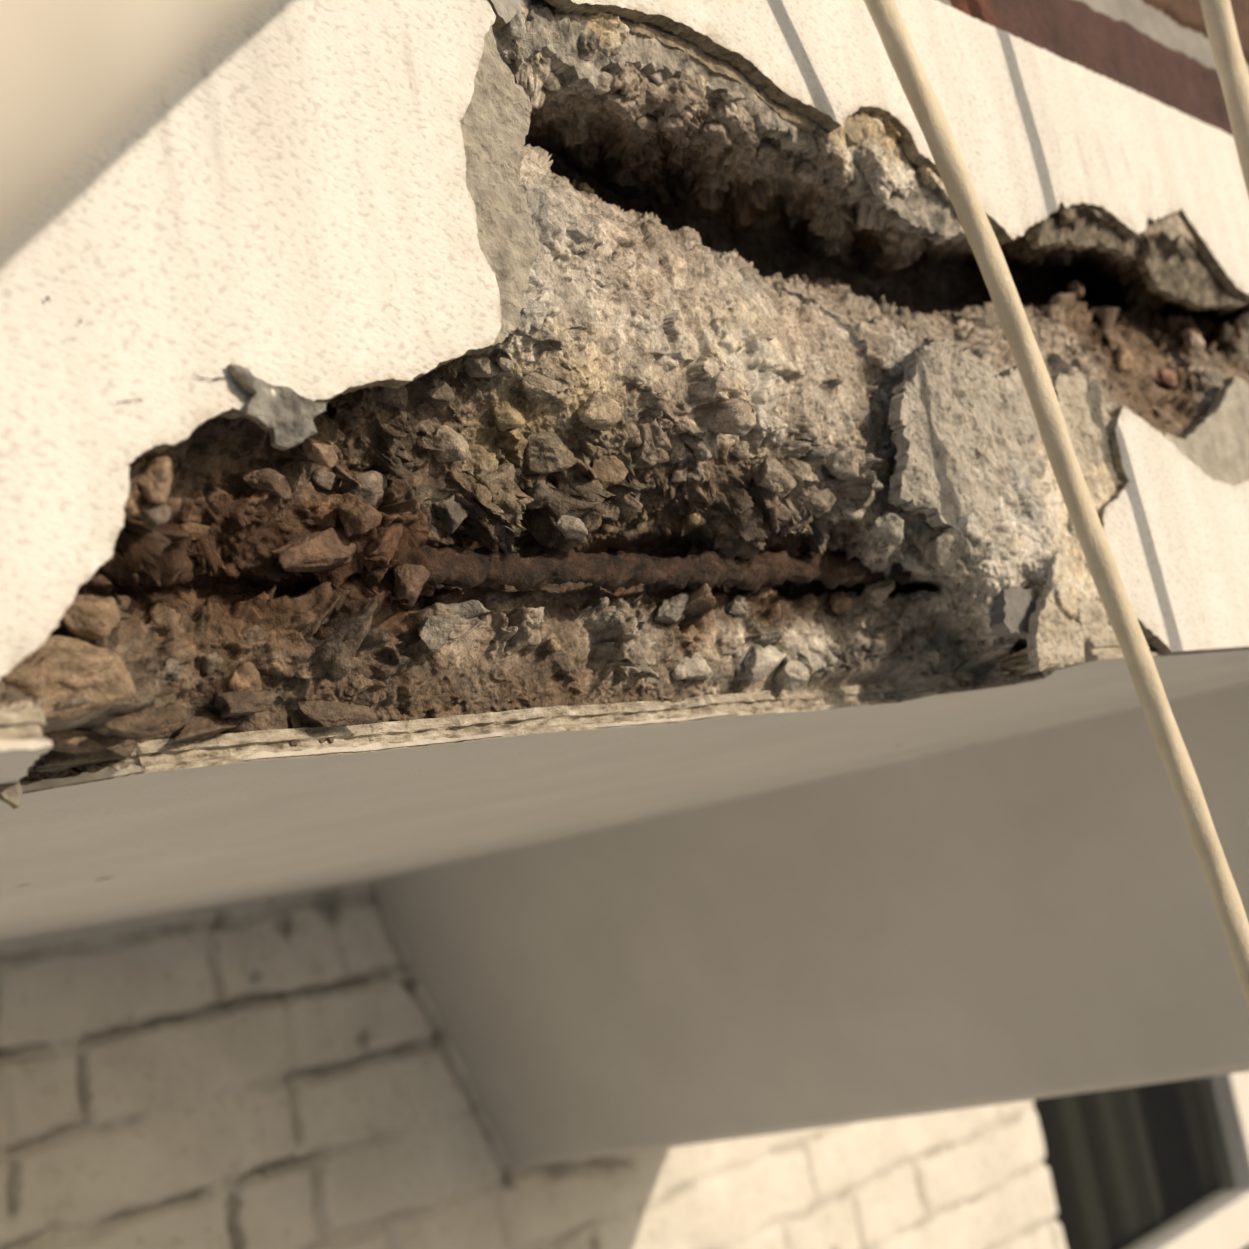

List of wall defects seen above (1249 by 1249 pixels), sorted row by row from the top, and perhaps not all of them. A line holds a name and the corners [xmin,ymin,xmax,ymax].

spalling [0,0,1116,809]
spalling [998,207,1249,513]